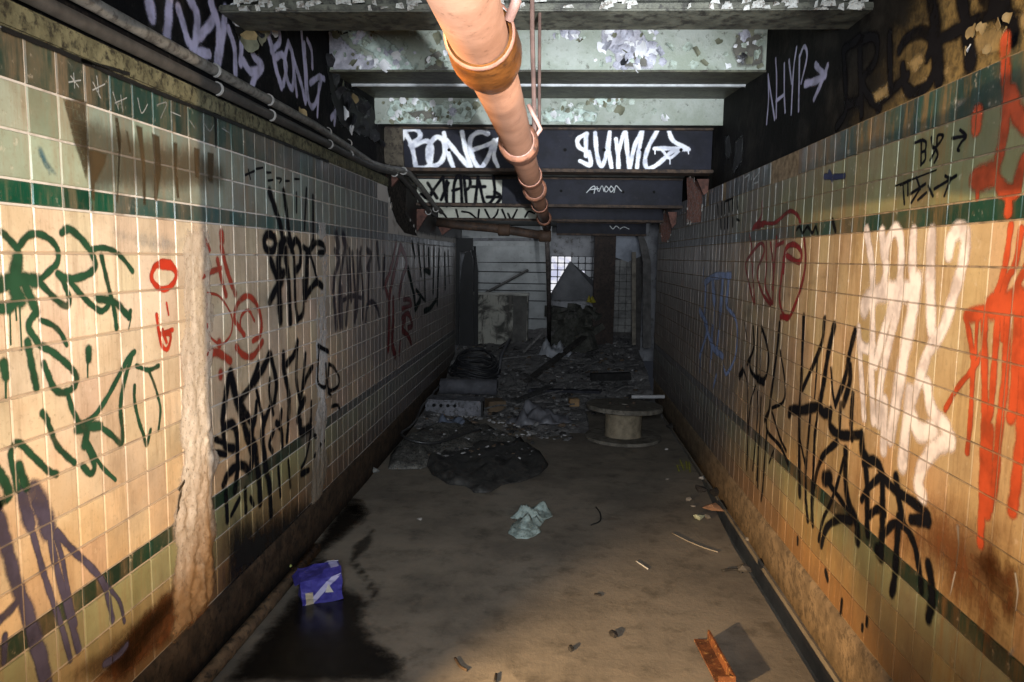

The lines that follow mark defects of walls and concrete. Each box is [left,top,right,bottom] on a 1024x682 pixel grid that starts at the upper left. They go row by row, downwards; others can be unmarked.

peeling [552,30,709,73]
peeling [715,29,767,69]
peeling [964,12,1024,56]
peeling [326,30,481,147]
peeling [537,98,635,124]
peeling [874,85,888,101]
damp [311,219,329,504]
efflorescence [172,231,220,642]
damp [309,499,368,566]
damp [352,531,373,573]
corrosion [106,586,179,680]
damp [229,584,402,682]